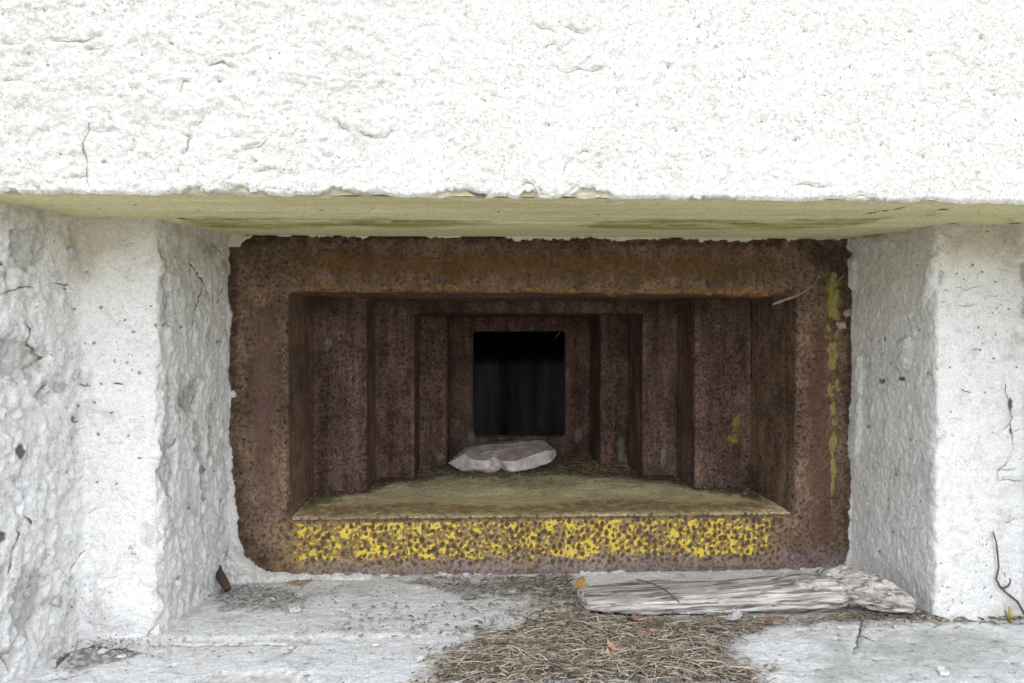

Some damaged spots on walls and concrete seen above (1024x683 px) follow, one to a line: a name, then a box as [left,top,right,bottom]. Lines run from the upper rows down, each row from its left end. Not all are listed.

crack [75,121,105,181]
damp [295,219,453,228]
damp [580,220,711,230]
damp [729,219,877,230]
corrosion [744,241,851,333]
crack [996,381,1021,482]
corrosion [234,482,253,549]
corrosion [296,499,775,517]